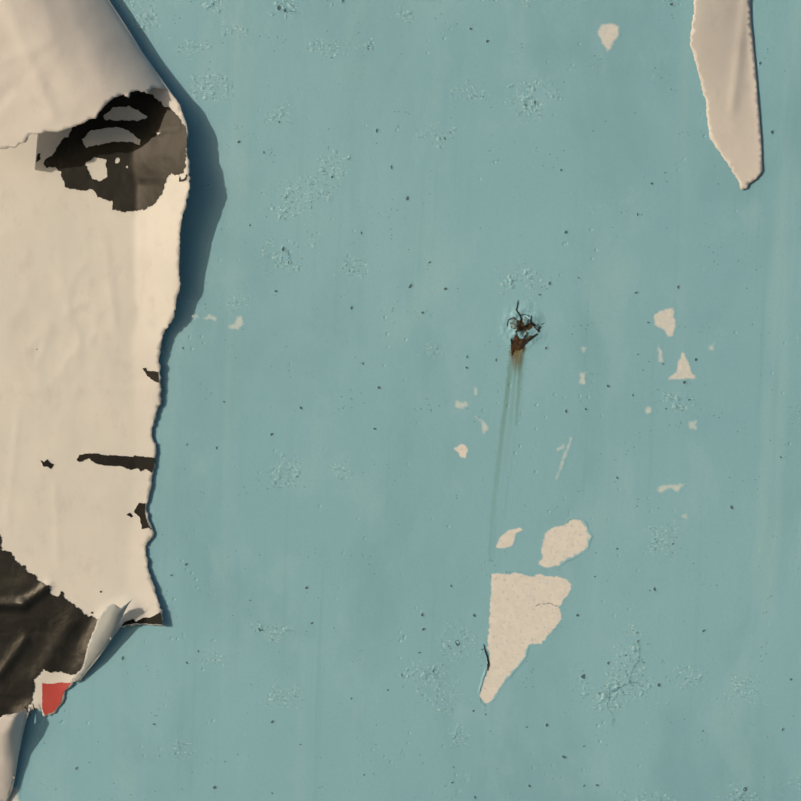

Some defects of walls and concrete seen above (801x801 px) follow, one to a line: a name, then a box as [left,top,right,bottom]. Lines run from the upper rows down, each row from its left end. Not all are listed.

peeling [595,20,621,54]
peeling [646,306,678,339]
peeling [666,349,699,385]
peeling [472,514,594,716]